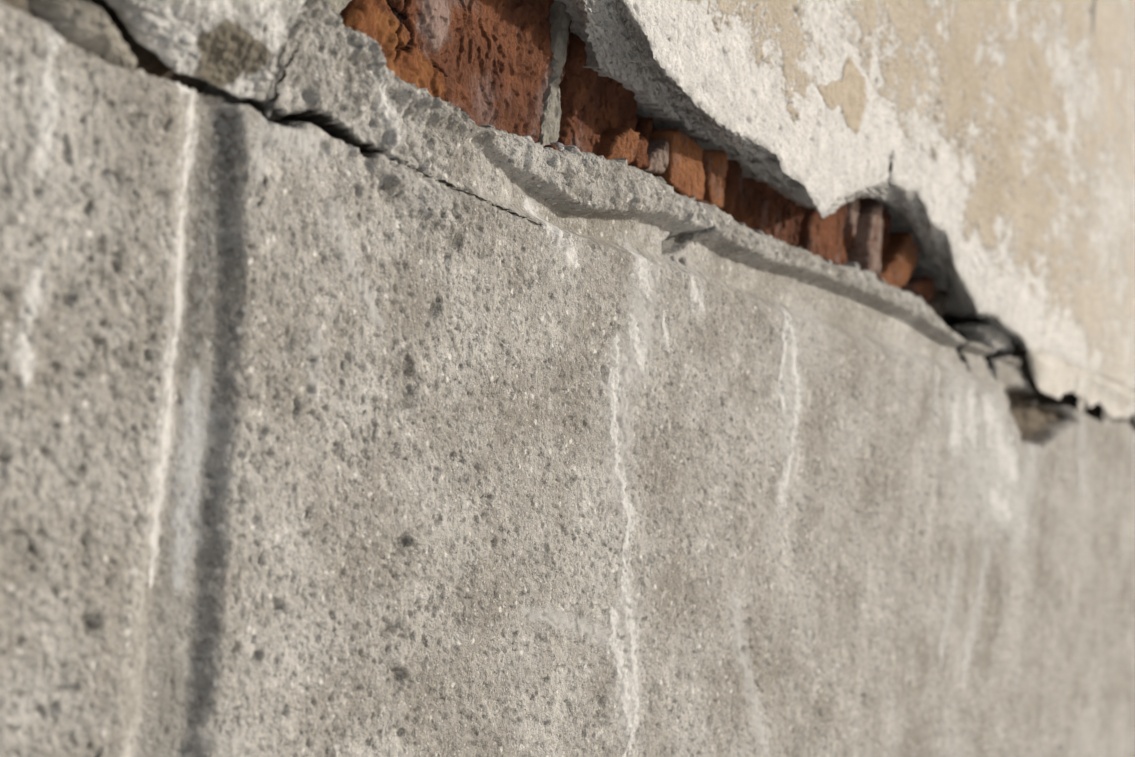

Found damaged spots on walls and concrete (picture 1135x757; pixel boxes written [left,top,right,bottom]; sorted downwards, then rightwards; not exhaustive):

crack [386,0,412,52]
crack [226,49,543,225]
spalling [522,135,578,151]
spalling [554,0,1028,354]
leakage [627,248,652,299]
leakage [688,274,704,315]
leakage [662,311,670,353]
crack [956,340,1013,370]
leakage [777,309,804,519]
leakage [608,314,646,757]